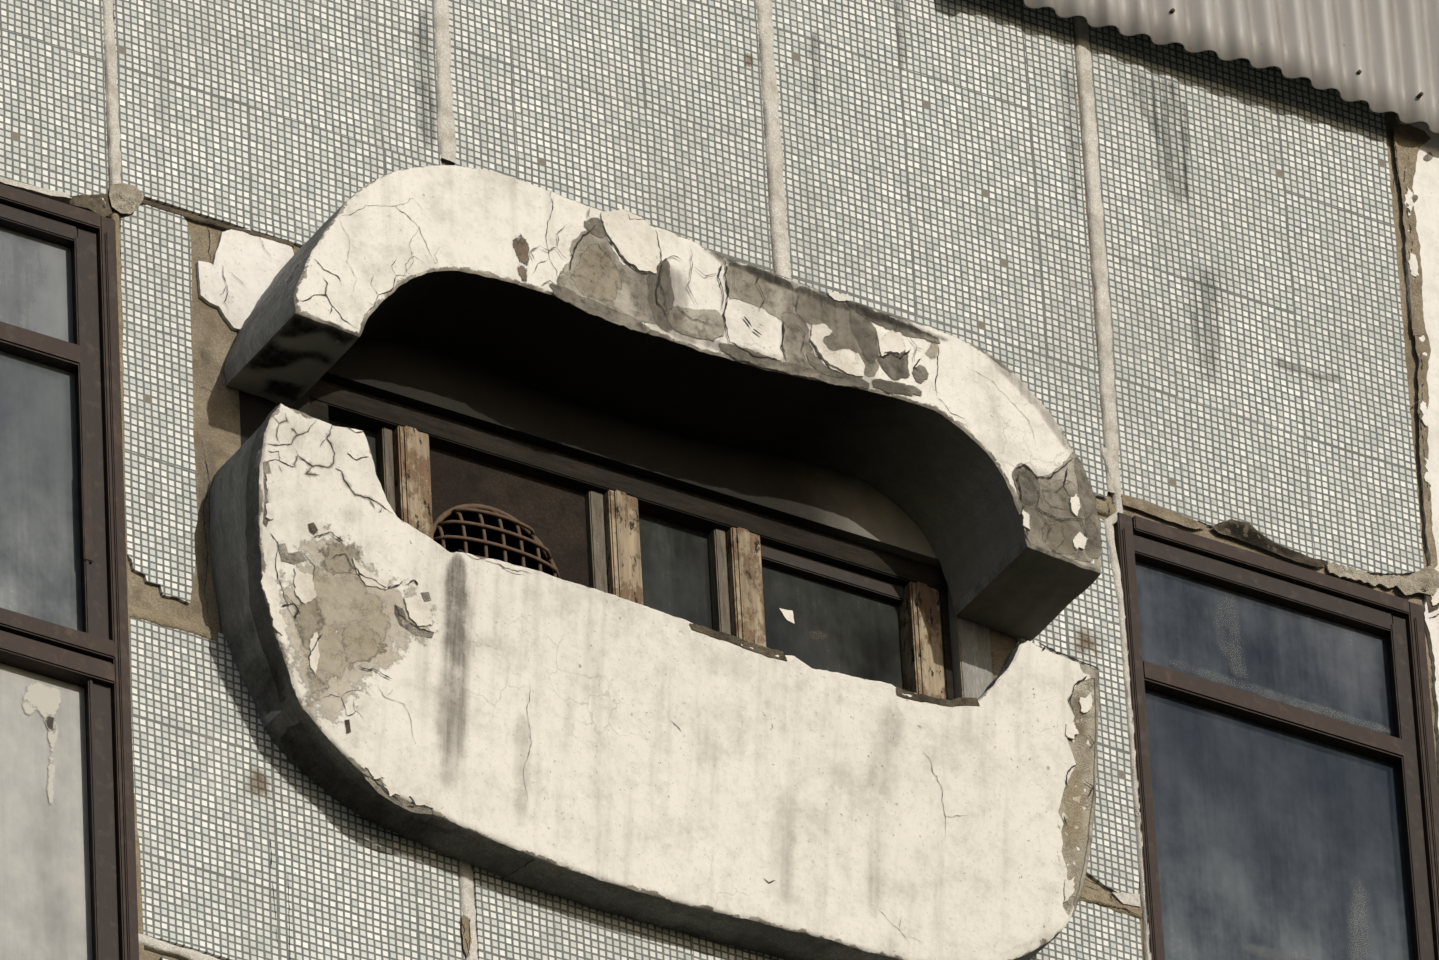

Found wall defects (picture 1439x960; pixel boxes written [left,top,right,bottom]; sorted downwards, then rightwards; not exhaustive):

crack [207,227,246,314]
crack [300,198,438,329]
crack [531,190,592,286]
peeling [549,209,940,396]
spalling [1121,124,1439,618]
peeling [263,461,274,527]
crack [266,413,390,512]
peeling [1012,452,1103,562]
peeling [260,522,434,675]
peeling [1057,676,1095,915]